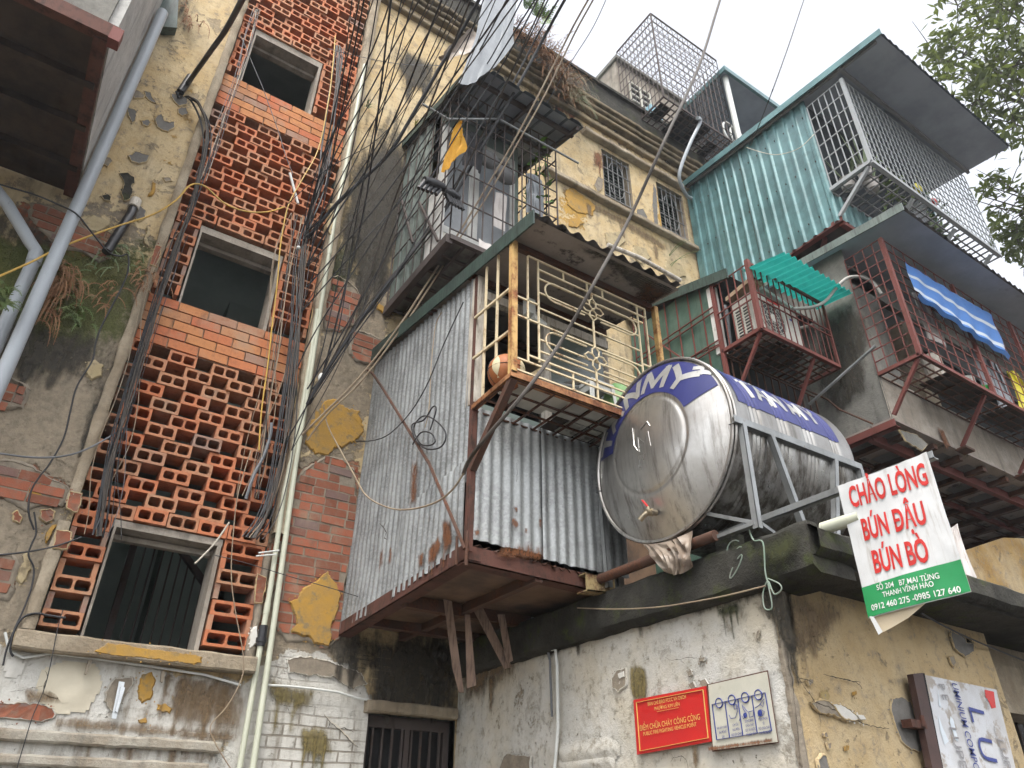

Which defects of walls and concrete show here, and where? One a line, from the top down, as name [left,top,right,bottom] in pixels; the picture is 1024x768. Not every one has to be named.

spalling [100,147,173,222]
spalling [316,275,383,366]
spalling [0,458,85,551]
spalling [254,399,368,691]
corrosion [418,521,452,572]
corrosion [500,507,541,559]
spalling [0,699,57,725]
peeling [88,639,208,726]
damp [270,681,313,732]
damp [335,654,357,687]
spalling [777,640,859,768]
damp [301,736,327,768]